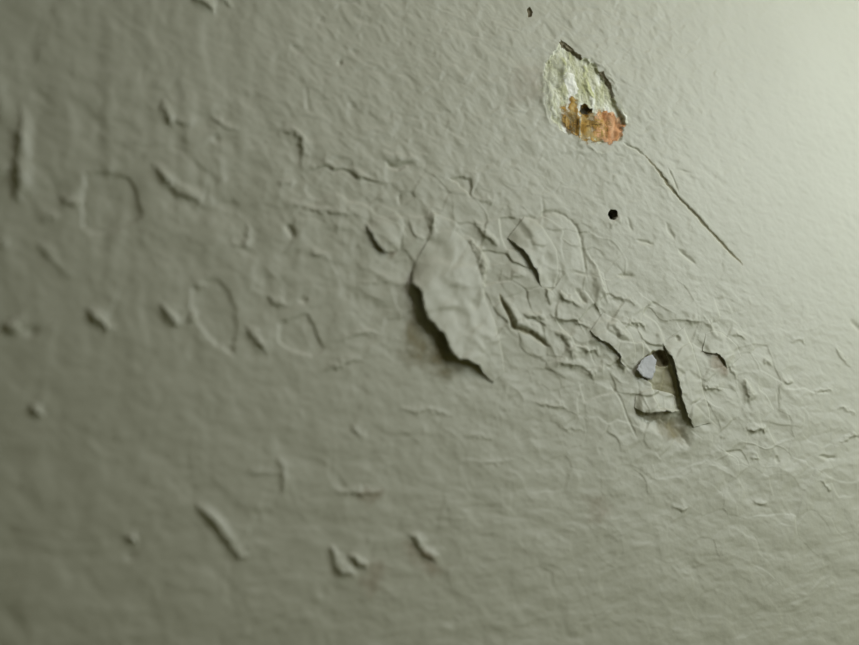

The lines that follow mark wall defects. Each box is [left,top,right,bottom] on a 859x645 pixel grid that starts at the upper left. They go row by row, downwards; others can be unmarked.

spalling [534,40,628,162]
crack [622,141,743,266]
peeling [277,172,760,447]
crack [499,294,550,347]